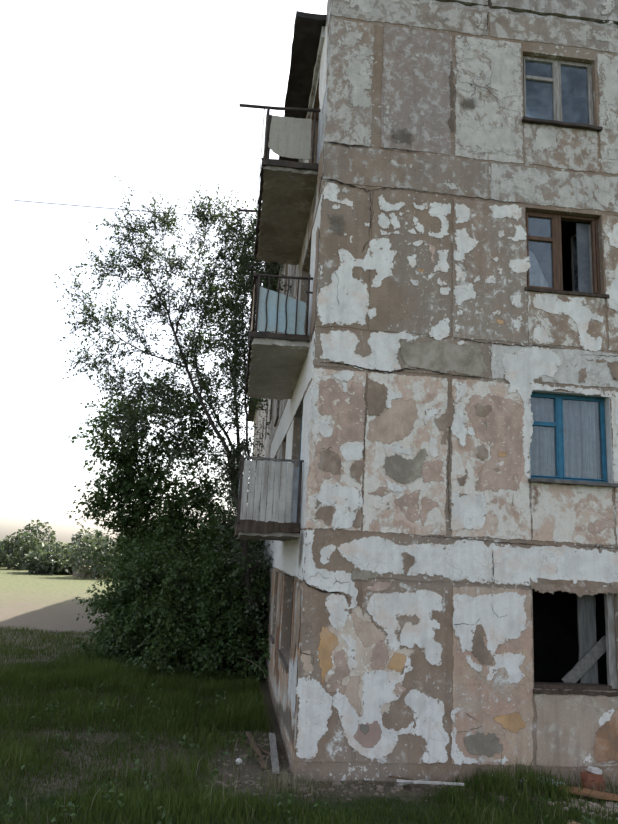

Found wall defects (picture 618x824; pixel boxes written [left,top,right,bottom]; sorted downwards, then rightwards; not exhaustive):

peeling [319,25,328,127]
peeling [338,24,375,112]
peeling [601,62,618,129]
peeling [317,146,353,209]
peeling [489,172,568,241]
peeling [288,195,618,765]